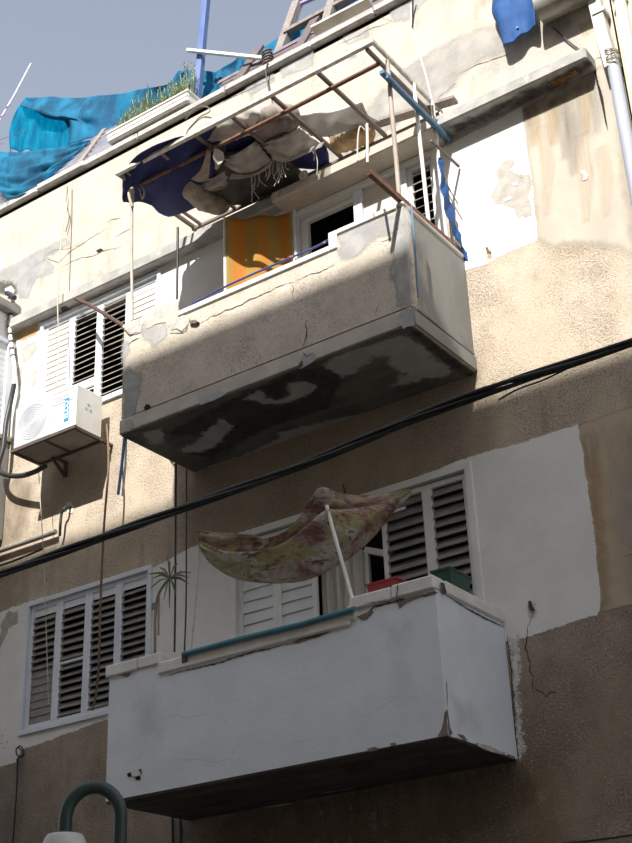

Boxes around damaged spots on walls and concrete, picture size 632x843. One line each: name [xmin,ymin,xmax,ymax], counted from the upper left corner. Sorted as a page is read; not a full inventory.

peeling [491,158,532,218]
flaking render [121,299,200,344]
leakage [412,332,475,375]
leakage [170,367,340,458]
peeling [0,611,18,647]
crack [171,631,329,675]
crack [357,582,503,627]
crack [525,601,557,696]
flaking render [438,683,467,740]
peeling [476,633,527,762]